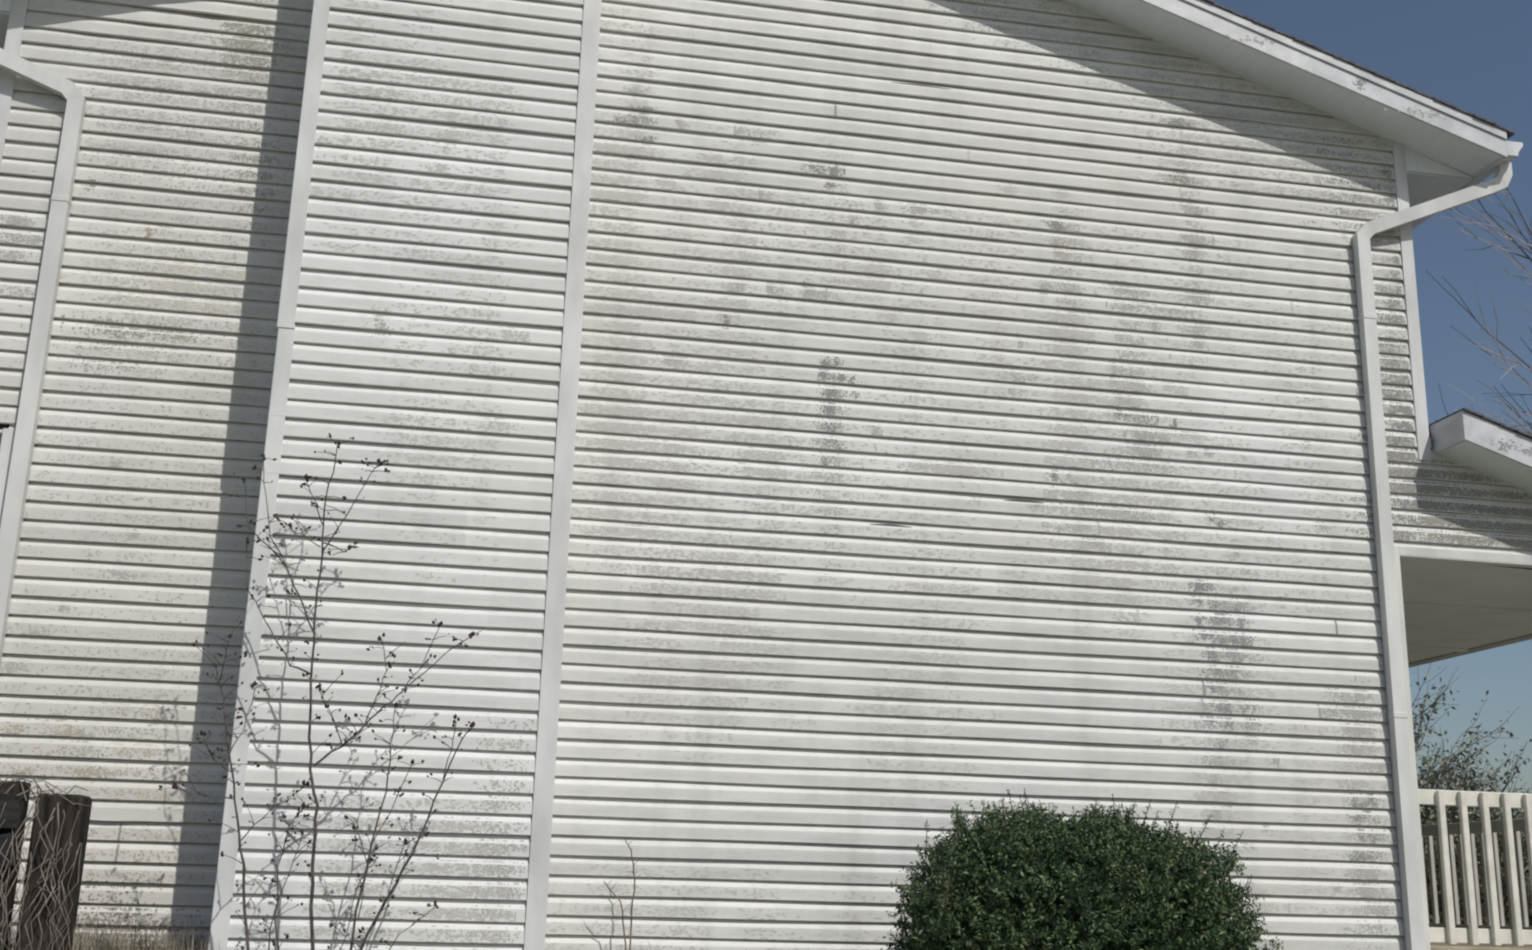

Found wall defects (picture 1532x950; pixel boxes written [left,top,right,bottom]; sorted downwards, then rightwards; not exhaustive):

water stain [546,0,1532,950]